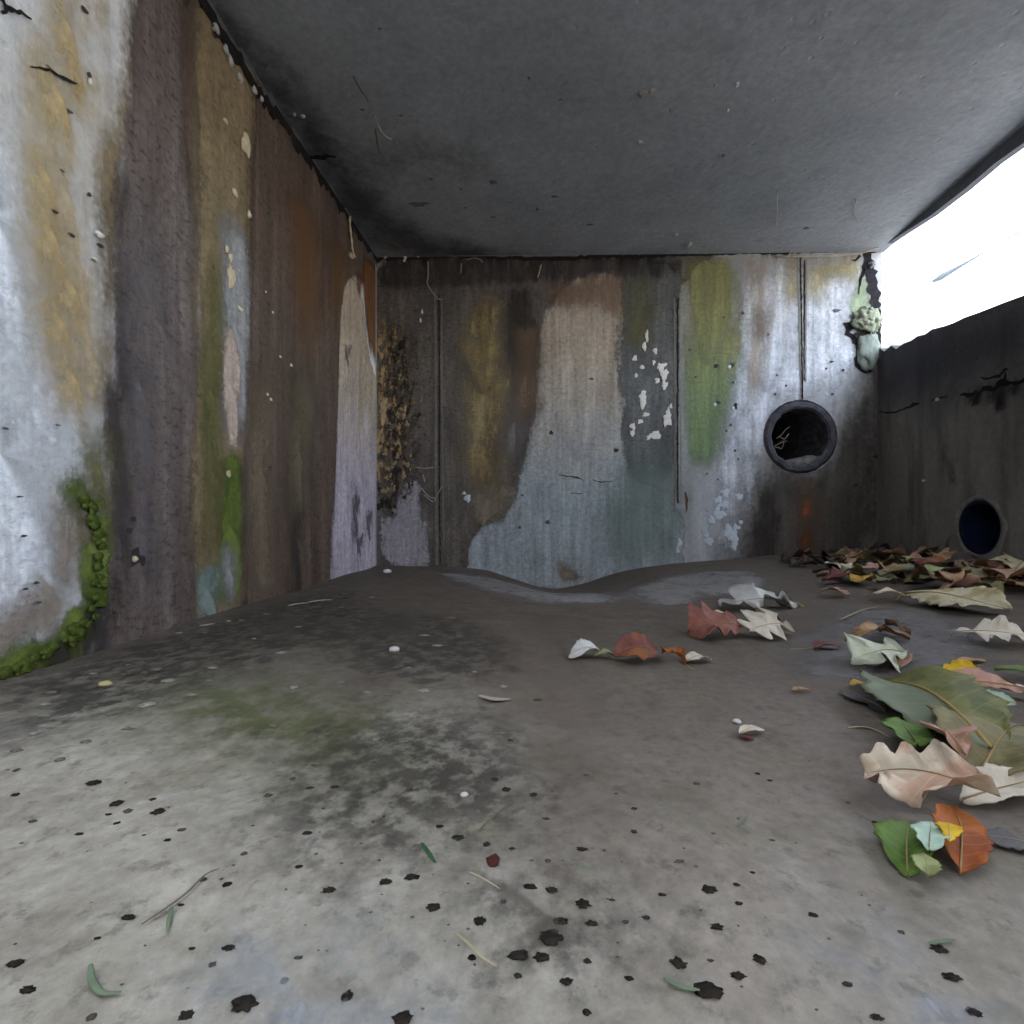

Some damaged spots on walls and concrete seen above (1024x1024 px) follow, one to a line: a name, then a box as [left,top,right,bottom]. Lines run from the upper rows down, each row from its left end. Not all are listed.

crack [0,0,32,20]
leakage [0,194,86,654]
crack [30,64,78,84]
crack [199,0,882,344]
leakage [212,20,877,606]
peeling [467,274,685,589]
peeling [704,472,743,551]
crack [879,368,1024,414]